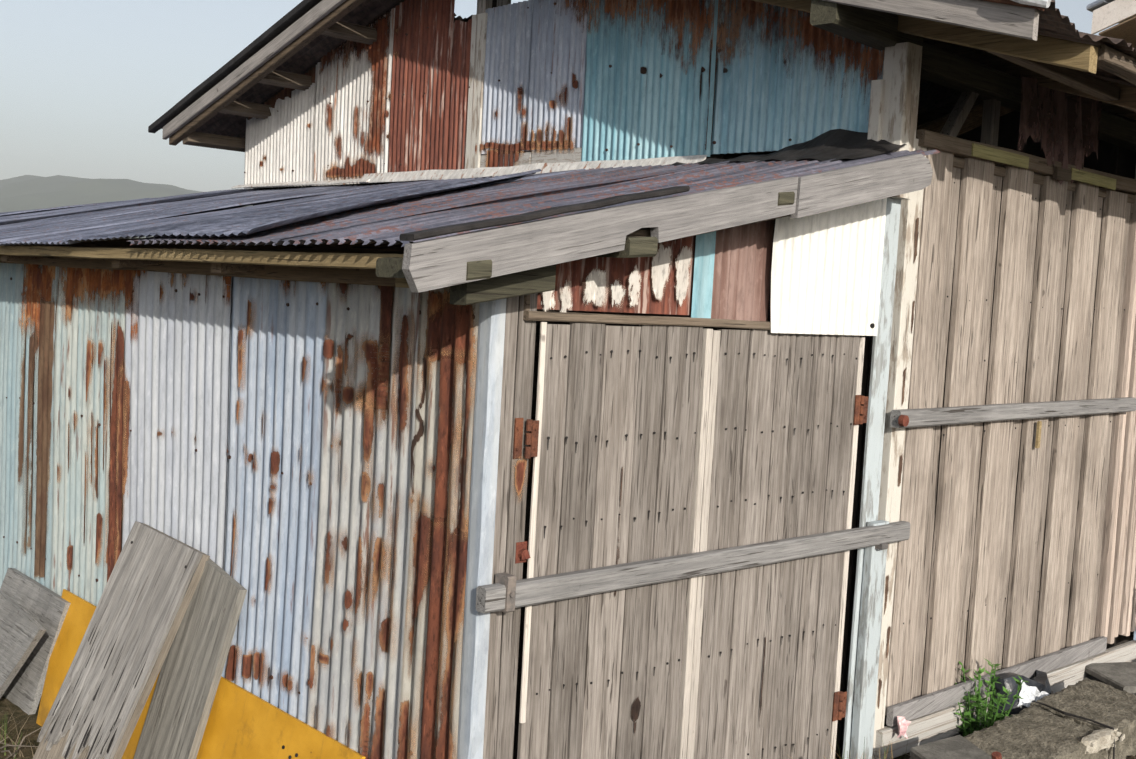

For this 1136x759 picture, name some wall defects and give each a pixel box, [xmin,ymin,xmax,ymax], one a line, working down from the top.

rust [319,11,391,178]
rust [475,74,578,167]
rust [555,0,885,150]
rust [159,273,207,301]
peeling [541,243,692,312]
rust [236,300,252,421]
rust [18,264,145,582]
rust [268,451,280,514]
rust [321,285,477,759]
rust [254,557,272,603]
rust [226,638,333,691]